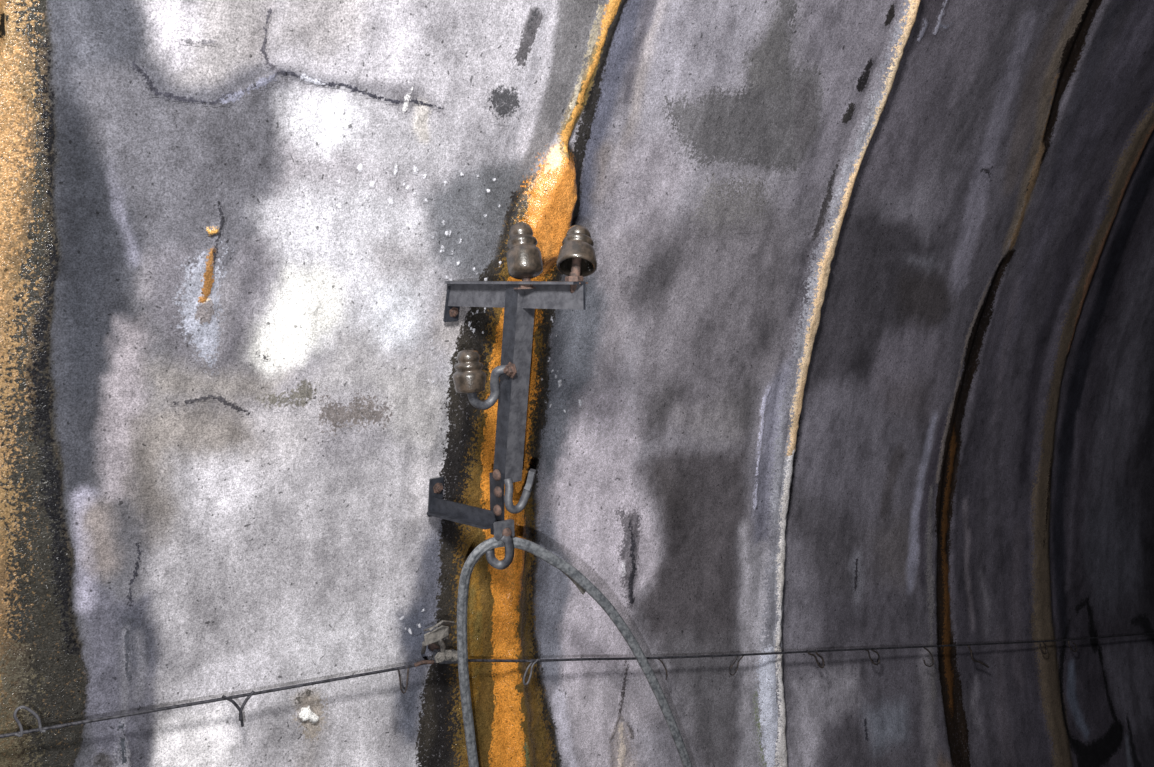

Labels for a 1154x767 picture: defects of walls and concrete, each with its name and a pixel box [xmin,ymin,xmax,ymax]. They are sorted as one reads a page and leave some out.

flaking render [0,0,10,54]
crack [128,5,444,112]
leakage [388,163,428,207]
leakage [442,171,502,229]
leakage [428,219,488,281]
leakage [467,307,487,335]
corrosion [0,0,92,767]
leakage [540,356,583,414]
leakage [657,0,954,767]
corrosion [411,307,566,767]
leakage [399,607,427,635]